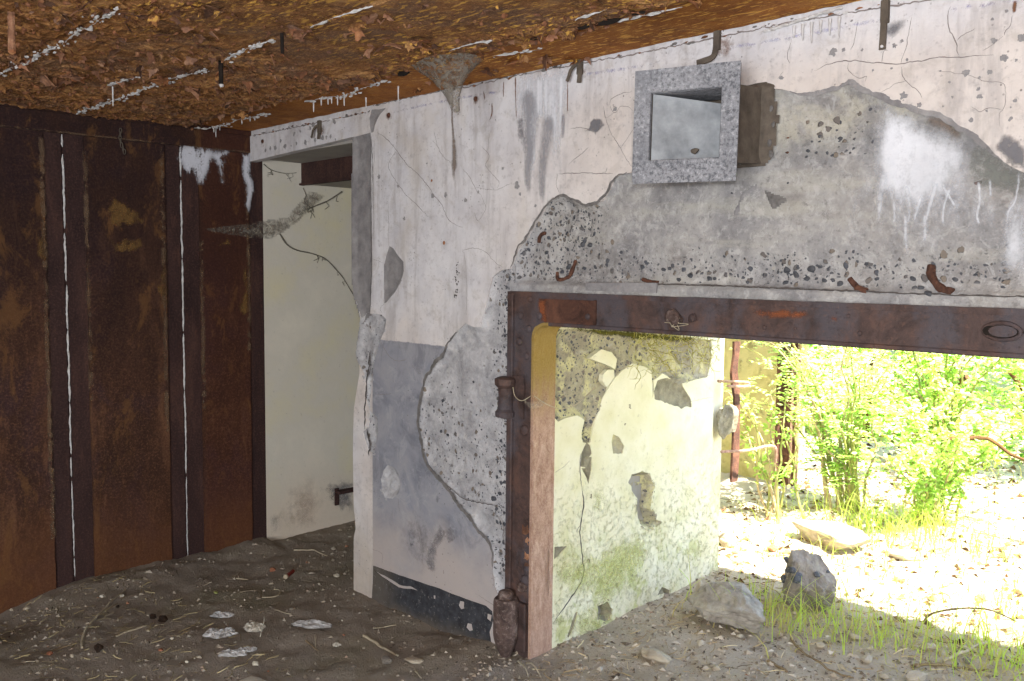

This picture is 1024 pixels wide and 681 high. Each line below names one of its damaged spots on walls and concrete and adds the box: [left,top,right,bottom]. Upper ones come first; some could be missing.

damp [243,156,254,209]
spalling [0,0,930,456]
damp [518,75,565,193]
crack [819,8,1012,124]
damp [878,111,962,239]
peeling [961,54,1018,112]
damp [998,137,1024,166]
damp [1007,182,1021,263]
damp [179,146,227,553]
spalling [416,76,1024,592]
crack [555,454,585,620]